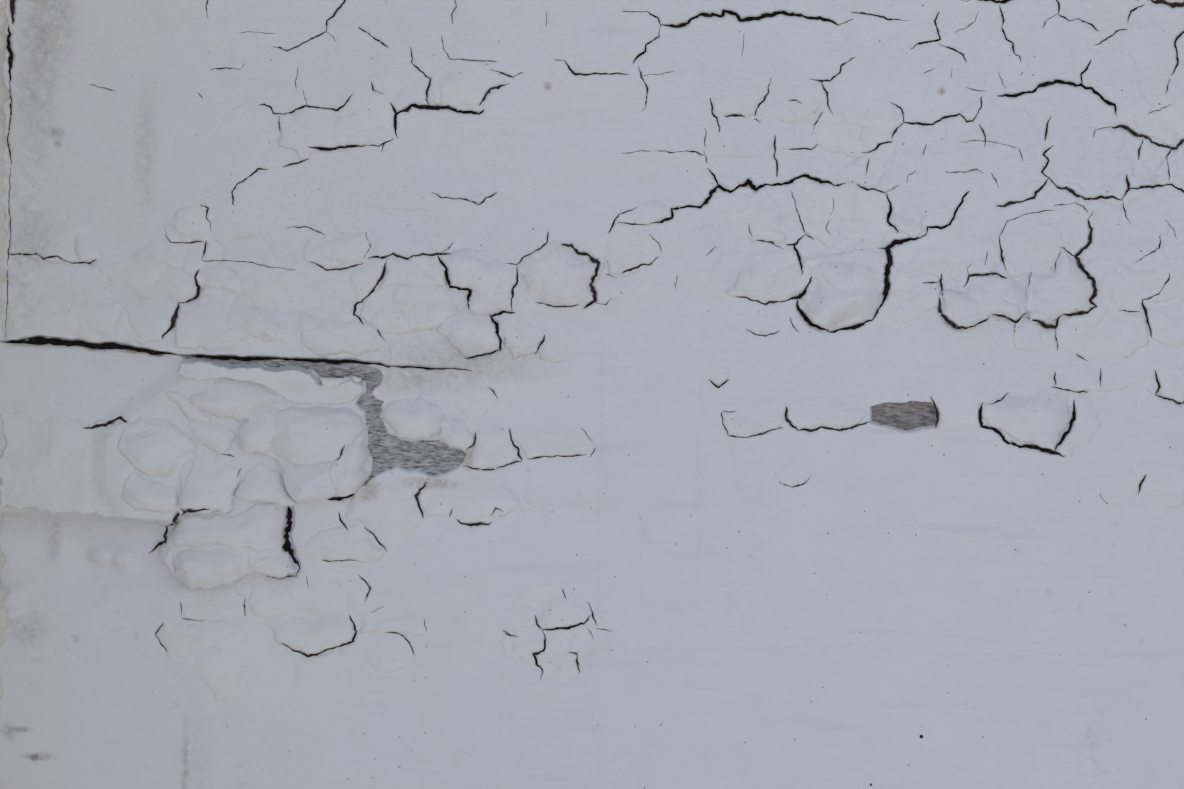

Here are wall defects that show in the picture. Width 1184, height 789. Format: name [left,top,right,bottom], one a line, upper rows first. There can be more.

crack [4,0,1184,457]
peeling [177,356,466,484]
peeling [871,401,936,430]